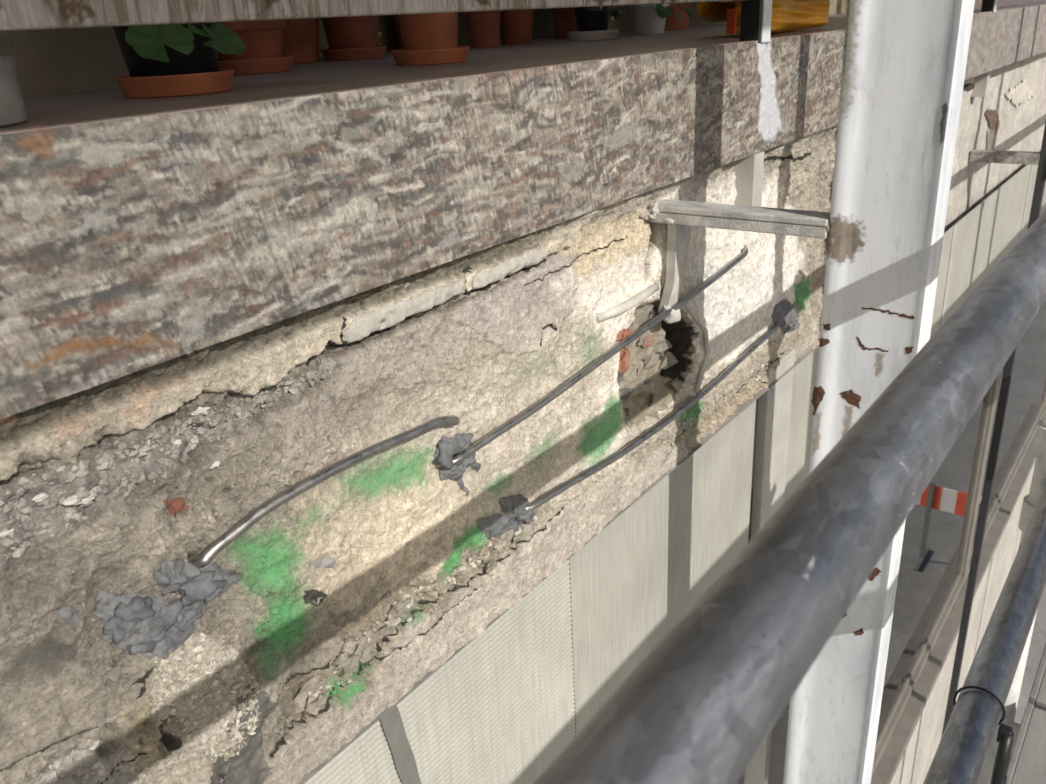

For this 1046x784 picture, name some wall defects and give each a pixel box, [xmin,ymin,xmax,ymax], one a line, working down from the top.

crack [764,152,812,163]
peeling [69,210,118,236]
peeling [180,316,206,348]
peeling [441,231,459,250]
crack [306,236,627,366]
spalling [0,358,341,571]
spalling [187,415,460,567]
spalling [293,245,790,717]
corrosion [843,406,852,436]
crack [269,507,564,757]
spalling [149,632,262,783]